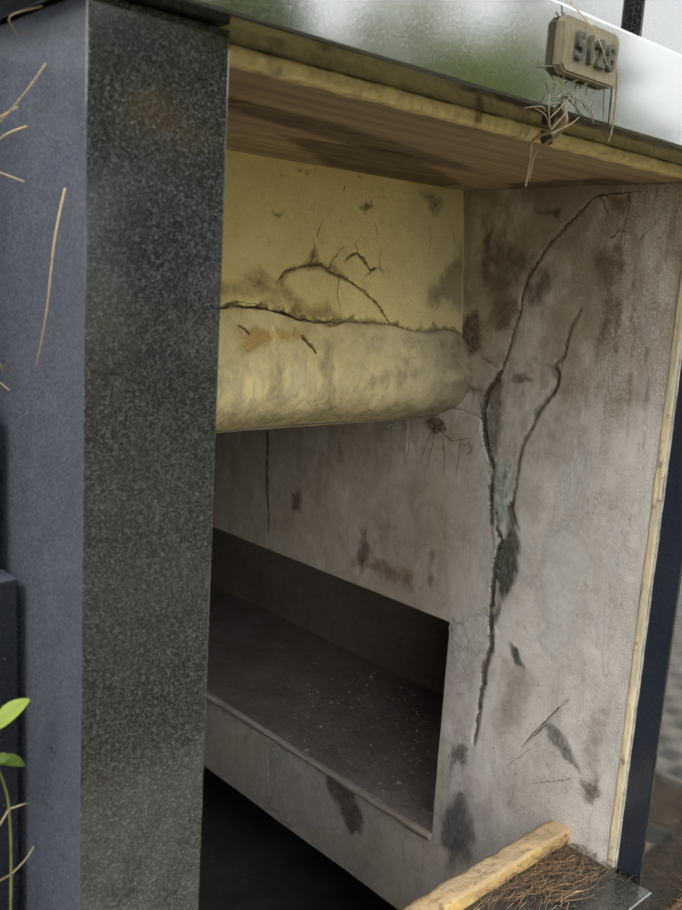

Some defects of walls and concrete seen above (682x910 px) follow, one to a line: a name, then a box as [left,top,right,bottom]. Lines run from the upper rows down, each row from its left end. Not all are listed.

crack [220,220,462,354]
crack [264,431,272,533]
crack [420,191,656,744]
leakage [264,739,362,833]
leakage [442,745,474,862]